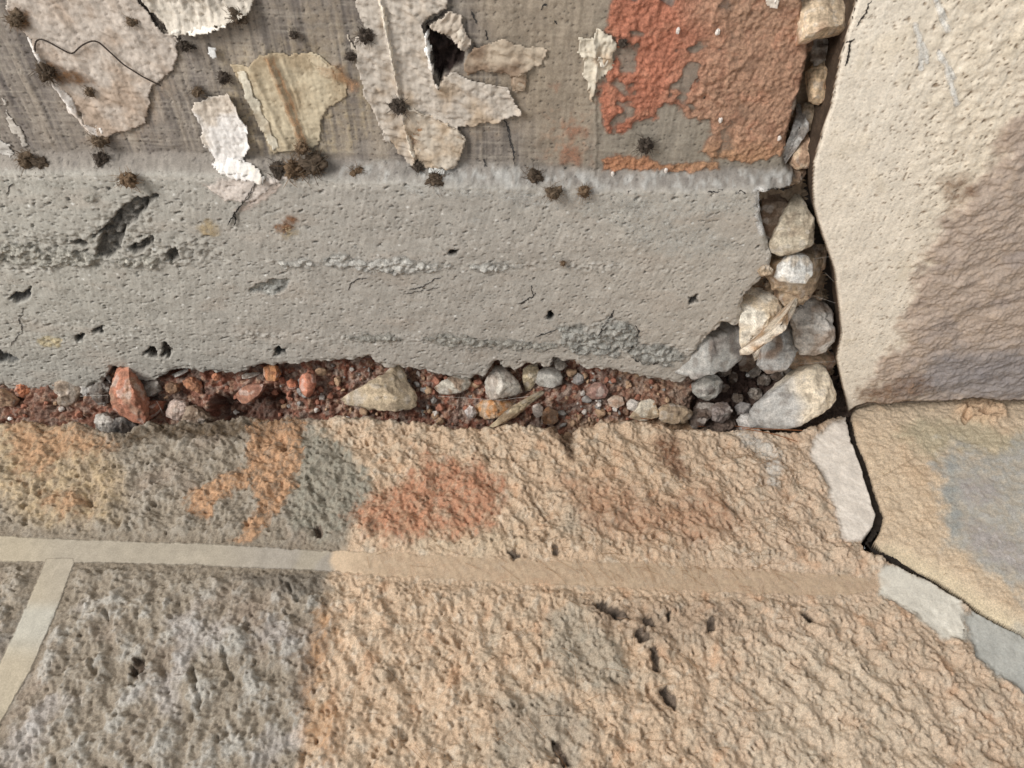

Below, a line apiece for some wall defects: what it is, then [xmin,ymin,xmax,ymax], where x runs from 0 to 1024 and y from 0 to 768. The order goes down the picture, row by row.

peeling [0,98,29,158]
peeling [5,0,254,137]
peeling [191,52,348,185]
peeling [347,0,548,174]
peeling [602,154,718,177]
peeling [570,345,686,368]
spalling [629,398,659,421]
crack [848,420,952,596]